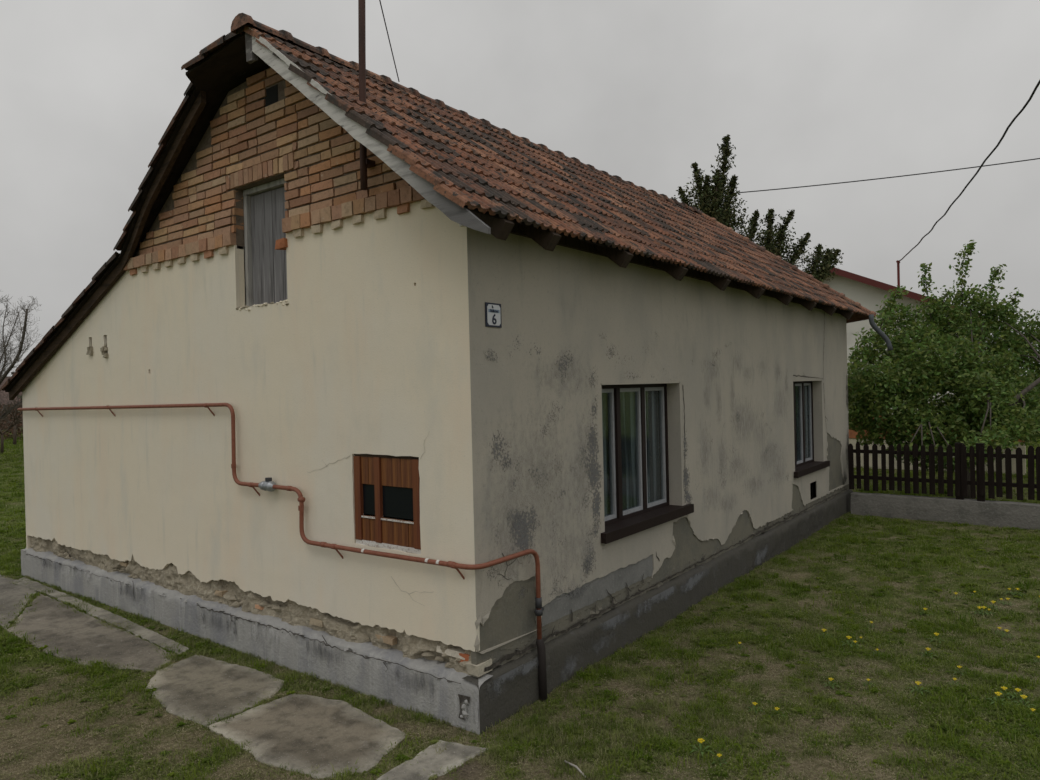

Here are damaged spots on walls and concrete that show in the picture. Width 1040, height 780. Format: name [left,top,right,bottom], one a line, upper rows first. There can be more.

damp [532,405,601,599]
peeling [790,481,804,516]
peeling [826,433,843,491]
flaking render [27,510,754,683]